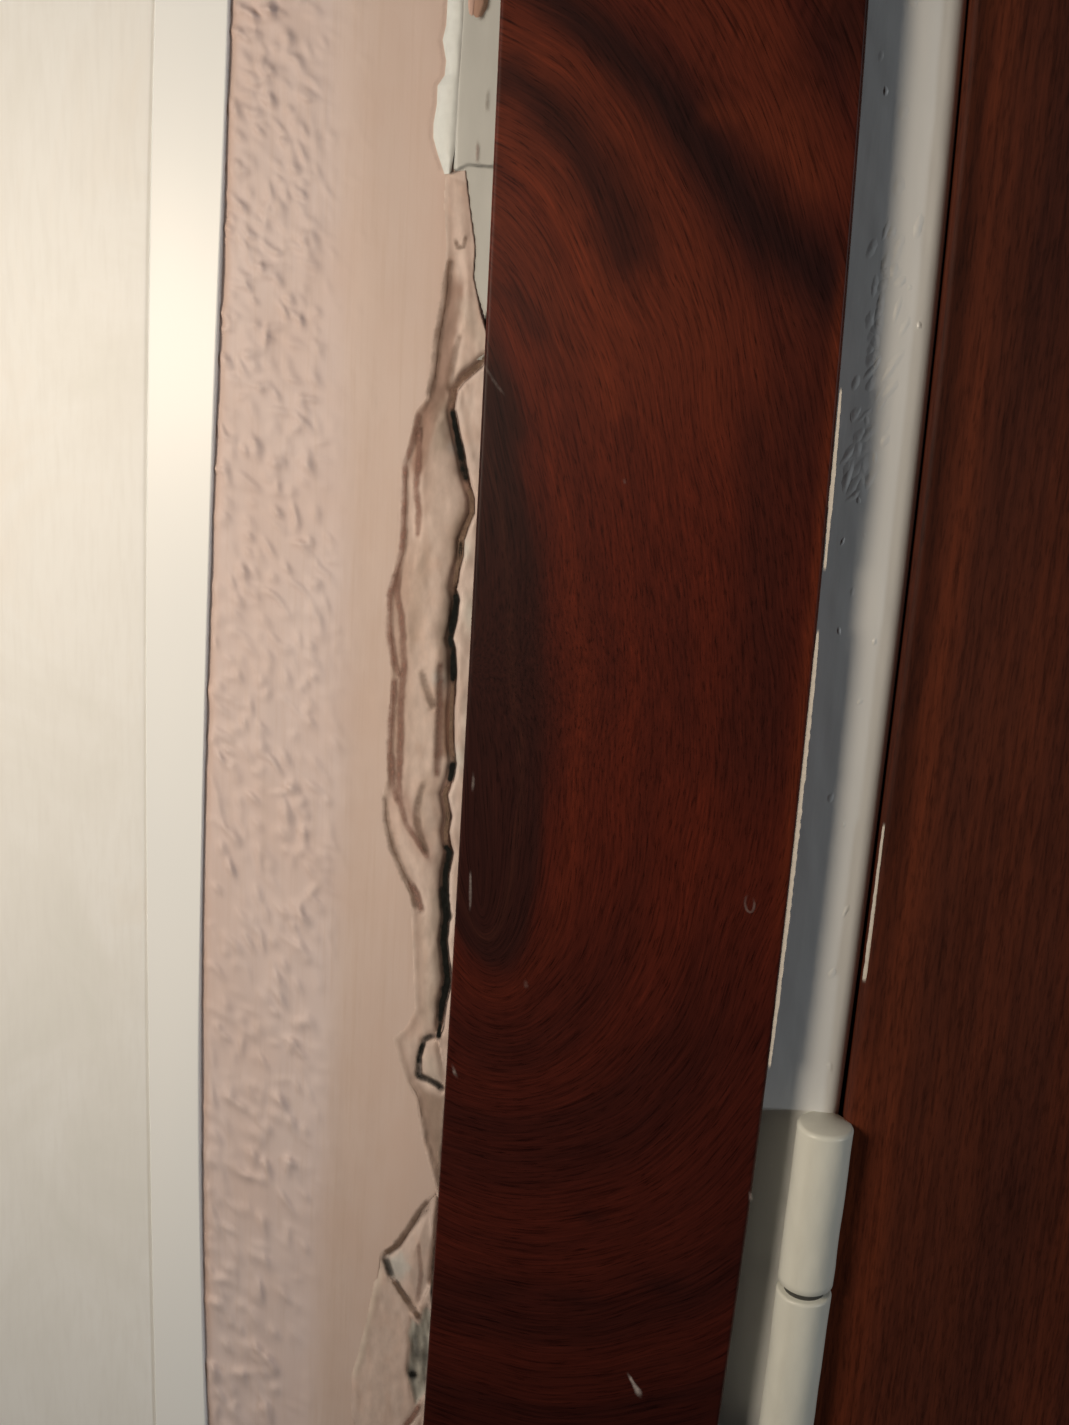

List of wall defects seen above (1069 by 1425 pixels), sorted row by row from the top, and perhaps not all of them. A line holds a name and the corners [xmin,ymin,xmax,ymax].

flaking render [351,1195,438,1425]